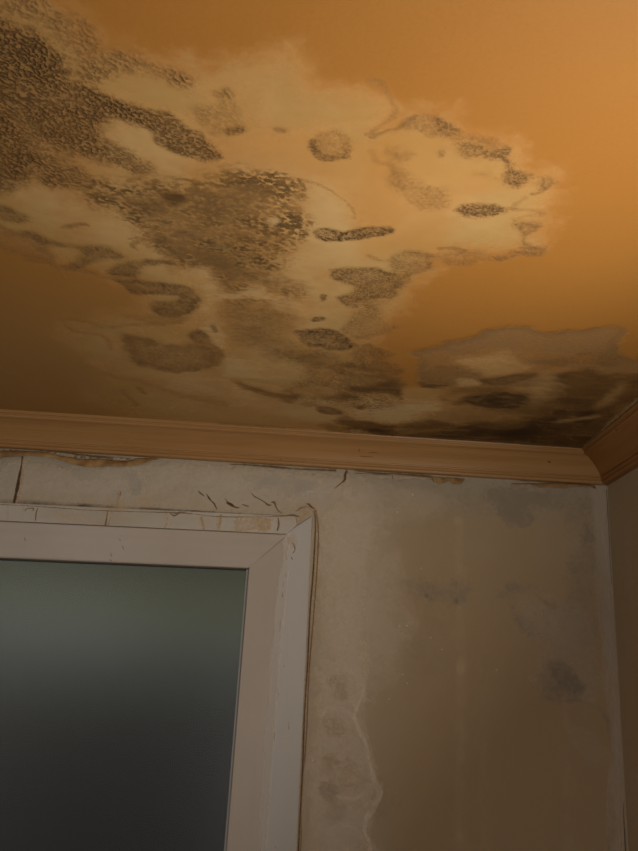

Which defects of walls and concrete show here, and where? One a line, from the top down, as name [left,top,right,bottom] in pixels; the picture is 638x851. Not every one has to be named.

damp [0,0,638,447]
crack [13,456,23,503]
crack [198,491,319,851]